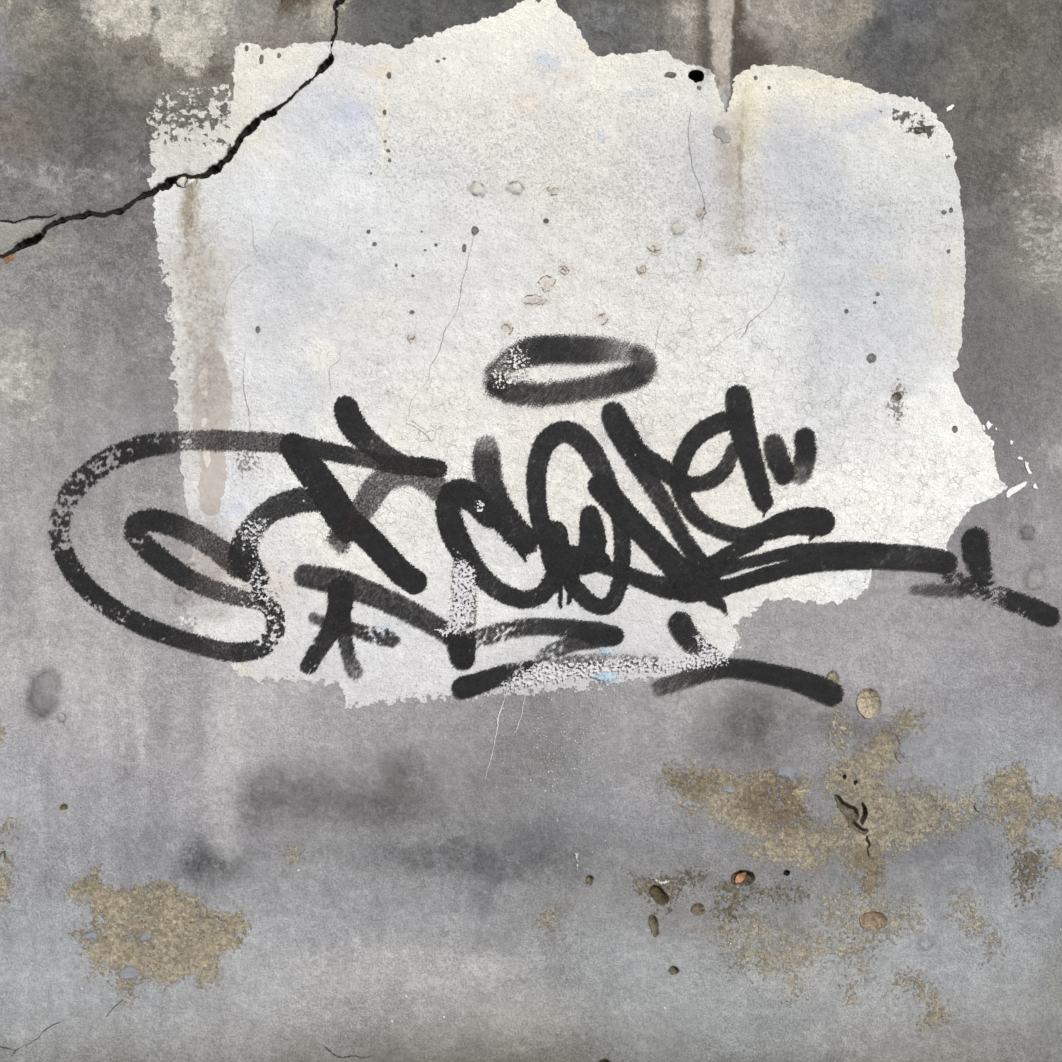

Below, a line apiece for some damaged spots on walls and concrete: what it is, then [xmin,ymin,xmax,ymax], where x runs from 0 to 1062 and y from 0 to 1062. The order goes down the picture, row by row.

crack [0,0,344,257]
damp [701,0,767,112]
damp [179,182,206,309]
crack [409,237,474,436]
peeling [61,860,252,1007]
peeling [627,688,1062,1039]